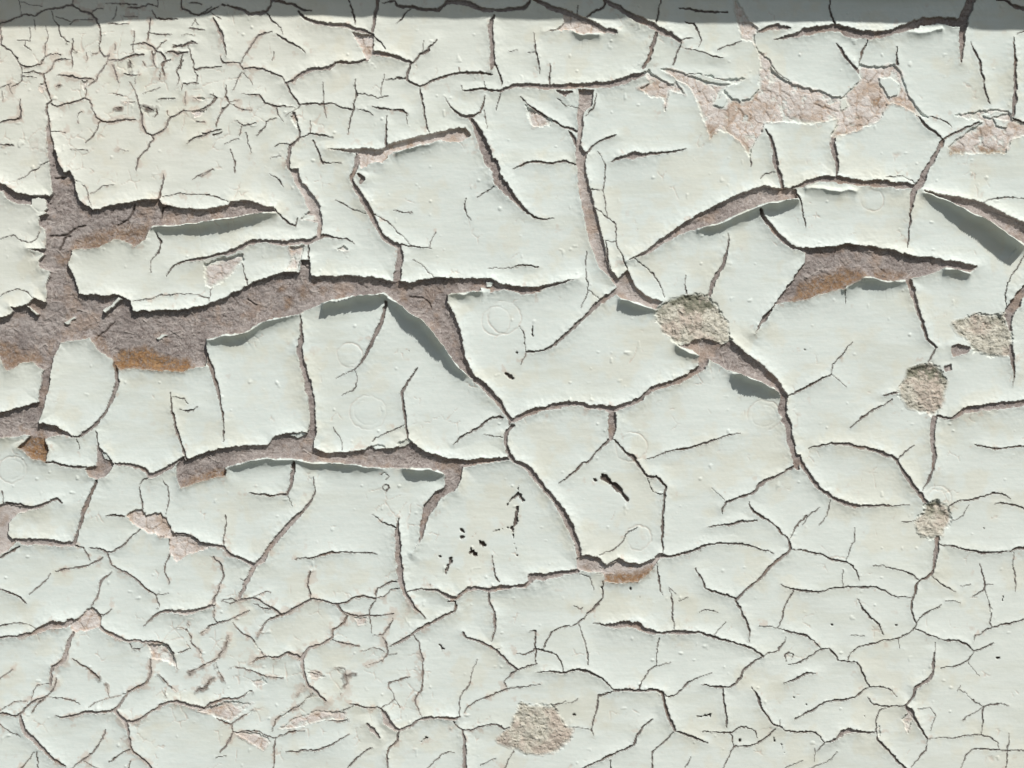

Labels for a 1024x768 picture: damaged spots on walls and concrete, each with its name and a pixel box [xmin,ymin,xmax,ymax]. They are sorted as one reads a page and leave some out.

crack [0,0,1024,394]
peeling [640,0,929,157]
peeling [948,109,1024,155]
spalling [0,150,574,462]
spalling [756,243,978,333]
spalling [85,440,114,480]
crack [0,255,1024,768]
spalling [576,553,663,590]